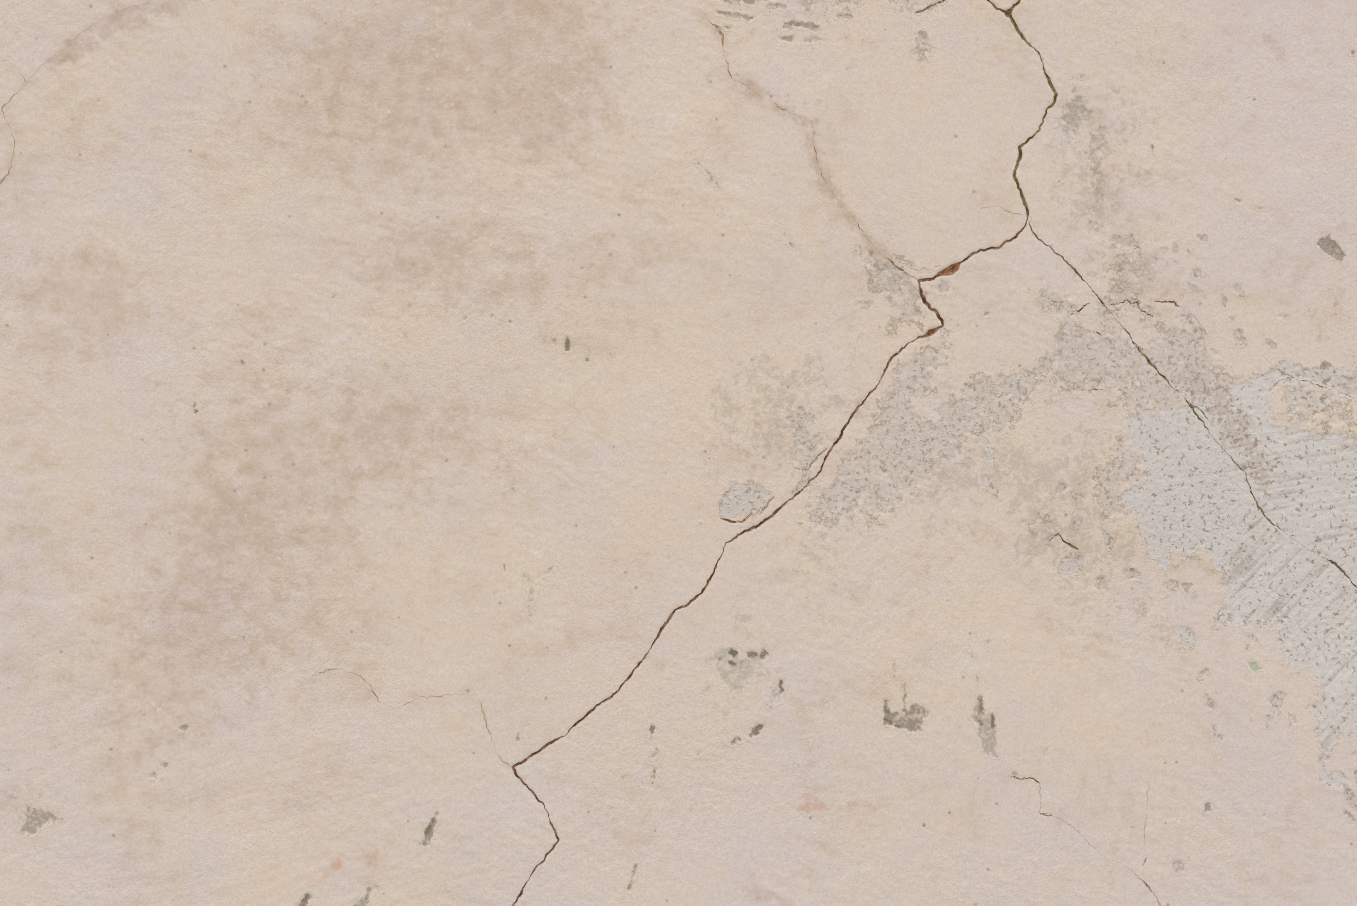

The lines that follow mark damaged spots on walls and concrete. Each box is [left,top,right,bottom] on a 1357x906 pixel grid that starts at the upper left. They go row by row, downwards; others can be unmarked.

peeling [877,0,953,72]
crack [313,0,1357,906]
peeling [713,213,1357,824]